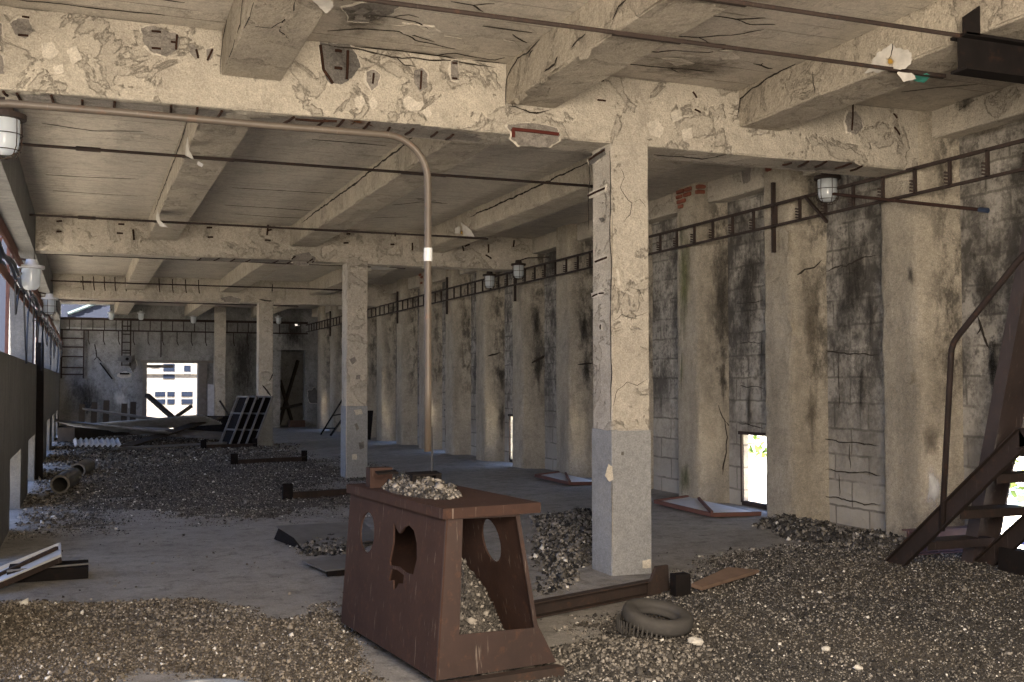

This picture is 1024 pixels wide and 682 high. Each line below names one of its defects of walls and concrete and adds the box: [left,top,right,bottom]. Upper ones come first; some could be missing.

spalling [0,15,34,74]
peeling [41,42,82,75]
spalling [139,24,215,61]
spalling [2,90,232,117]
spalling [250,41,481,141]
spalling [505,121,561,148]
flaking render [676,184,706,209]
damp [989,347,997,388]